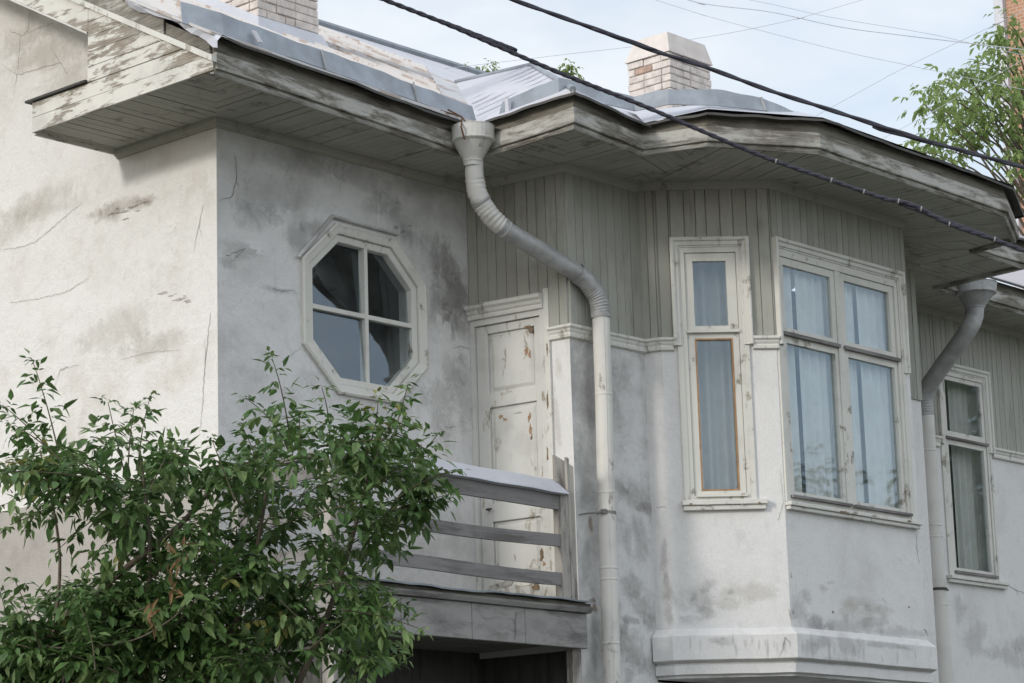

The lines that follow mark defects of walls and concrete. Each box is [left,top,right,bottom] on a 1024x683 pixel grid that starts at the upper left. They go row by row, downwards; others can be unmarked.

crack [2,9,69,94]